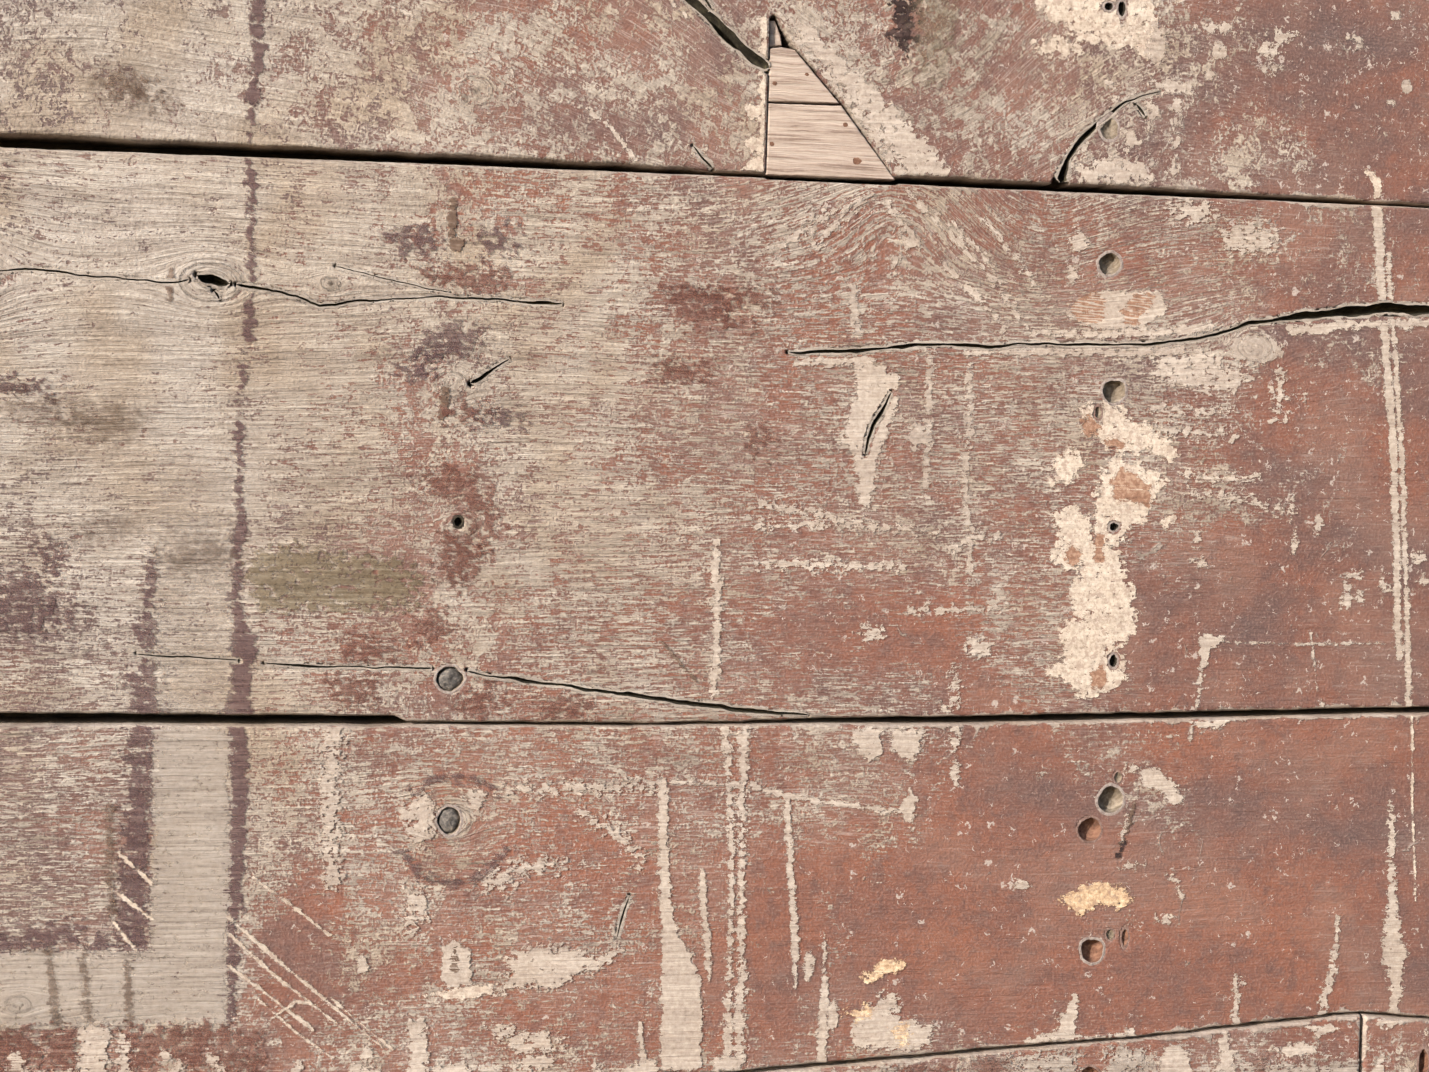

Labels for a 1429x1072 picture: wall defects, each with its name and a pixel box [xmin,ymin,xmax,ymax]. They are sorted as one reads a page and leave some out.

crack [680,0,770,72]
crack [1053,88,1161,183]
crack [0,263,189,288]
crack [236,262,563,311]
crack [788,299,1429,358]
crack [862,391,893,455]
peeling [741,0,1429,1072]
crack [136,651,432,673]
crack [467,667,808,718]